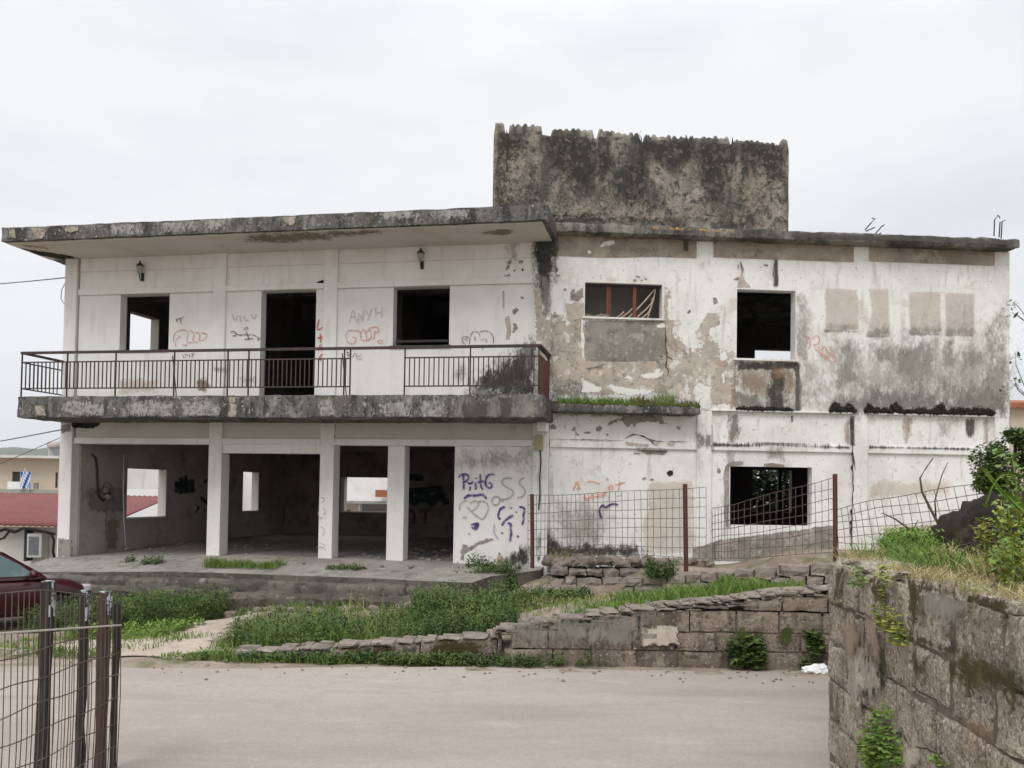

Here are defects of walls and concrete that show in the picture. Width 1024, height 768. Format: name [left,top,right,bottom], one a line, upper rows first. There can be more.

water stain [495,133,522,206]
water stain [540,136,788,204]
water stain [160,219,225,233]
water stain [531,240,559,318]
flaking render [553,236,697,276]
water stain [228,397,237,417]
water stain [445,338,603,417]
peeling [502,287,739,410]
peeling [572,415,680,436]
spalling [625,441,676,455]
crack [848,419,856,545]
water stain [836,342,1008,450]